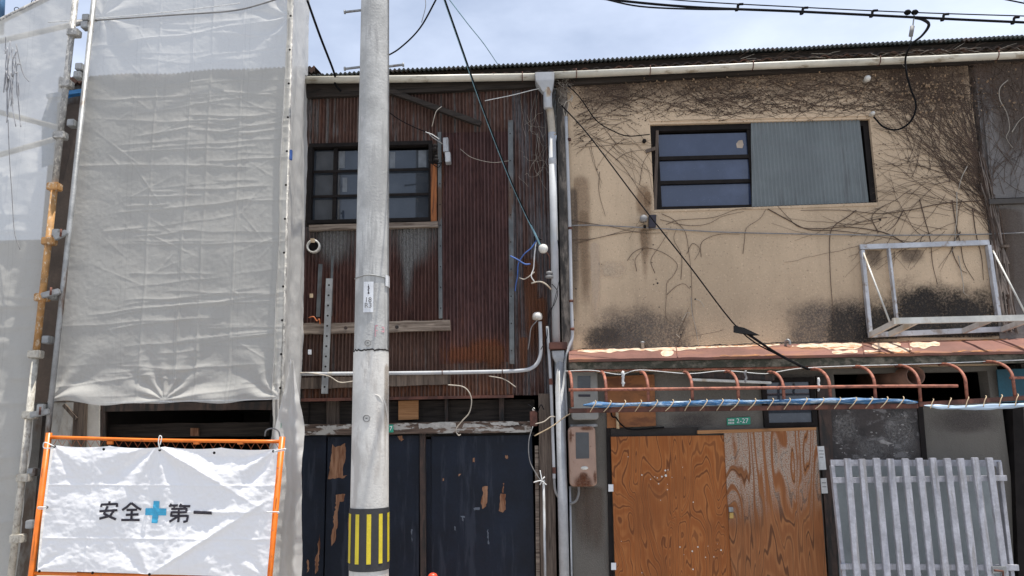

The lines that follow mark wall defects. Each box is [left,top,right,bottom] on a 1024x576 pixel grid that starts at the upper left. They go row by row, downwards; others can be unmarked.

damp [401,228,427,288]
damp [792,209,1024,344]
damp [588,312,685,349]
peeling [578,341,940,356]
peeling [328,443,347,479]
peeling [454,483,506,530]
peeling [307,494,349,574]